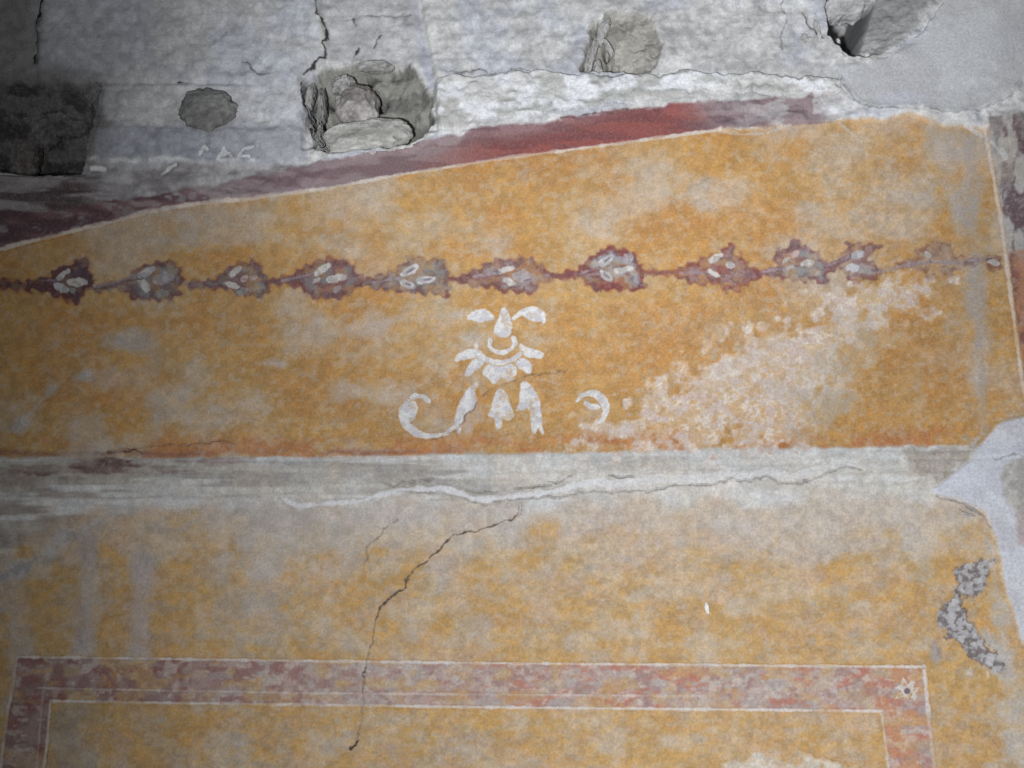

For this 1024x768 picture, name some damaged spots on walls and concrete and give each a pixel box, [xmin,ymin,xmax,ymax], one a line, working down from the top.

crack [300,0,412,152]
spalling [900,426,992,484]
crack [348,466,861,751]
spalling [919,558,1007,680]